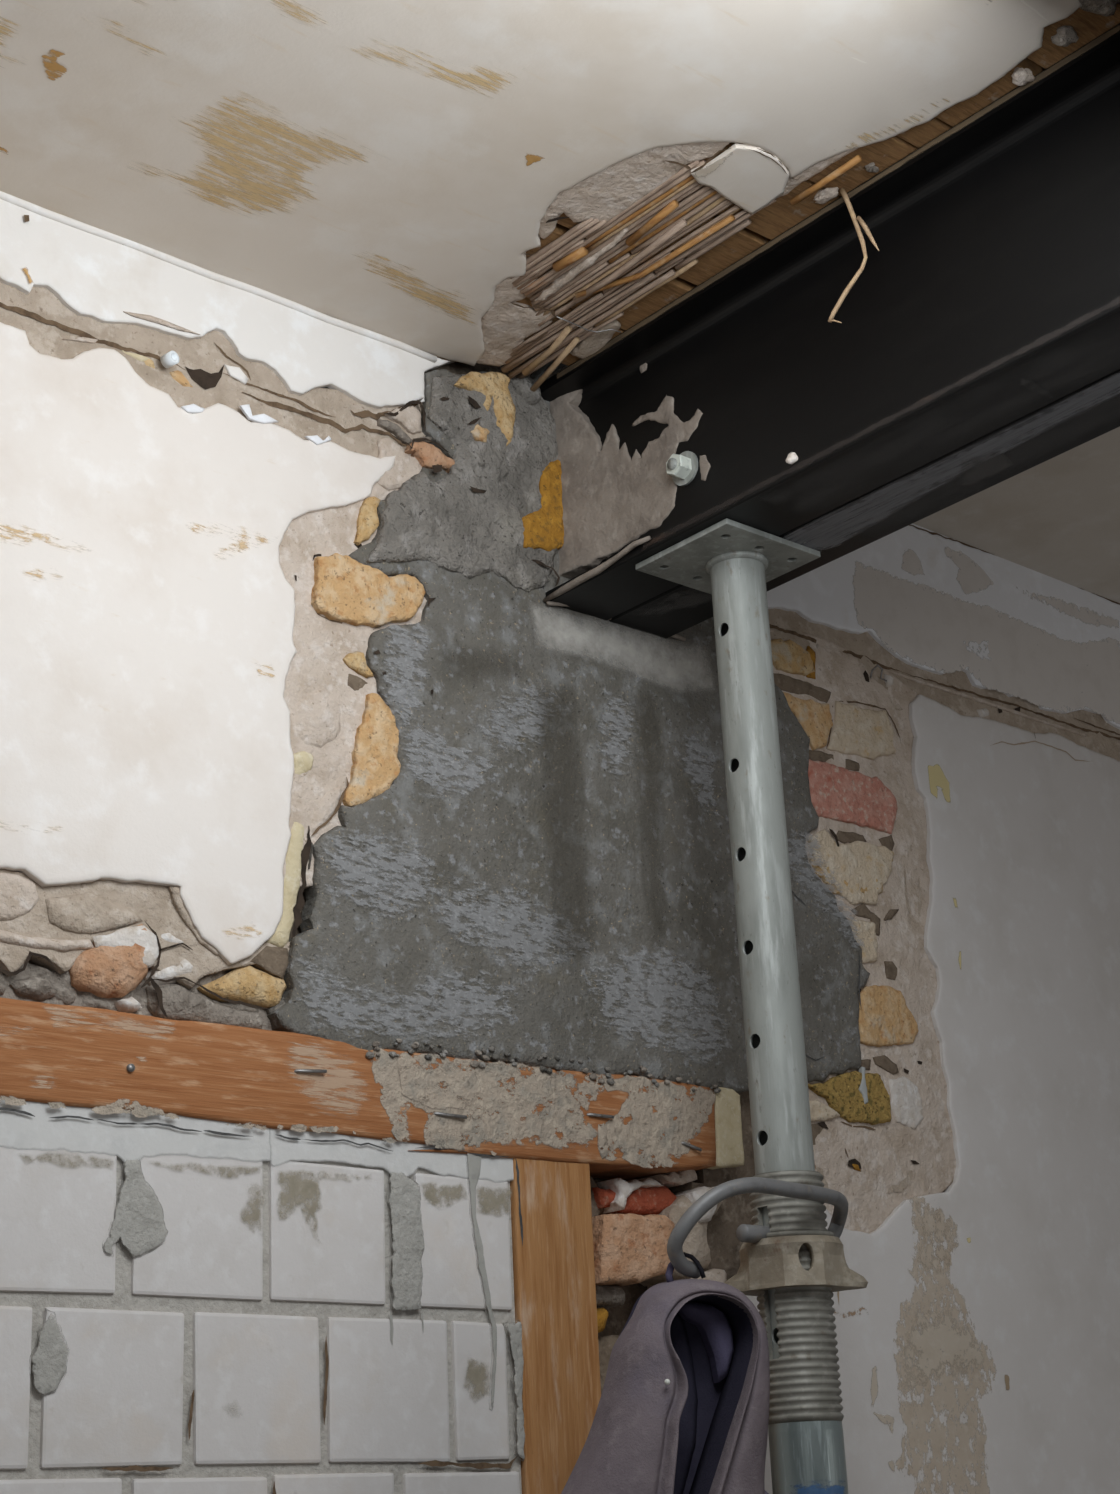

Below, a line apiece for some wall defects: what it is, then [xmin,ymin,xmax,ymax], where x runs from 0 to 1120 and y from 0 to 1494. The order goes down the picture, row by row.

flaking render [0,268,455,1031]
flaking render [522,460,564,551]
flaking render [453,142,858,446]
flaking render [768,547,1120,1494]